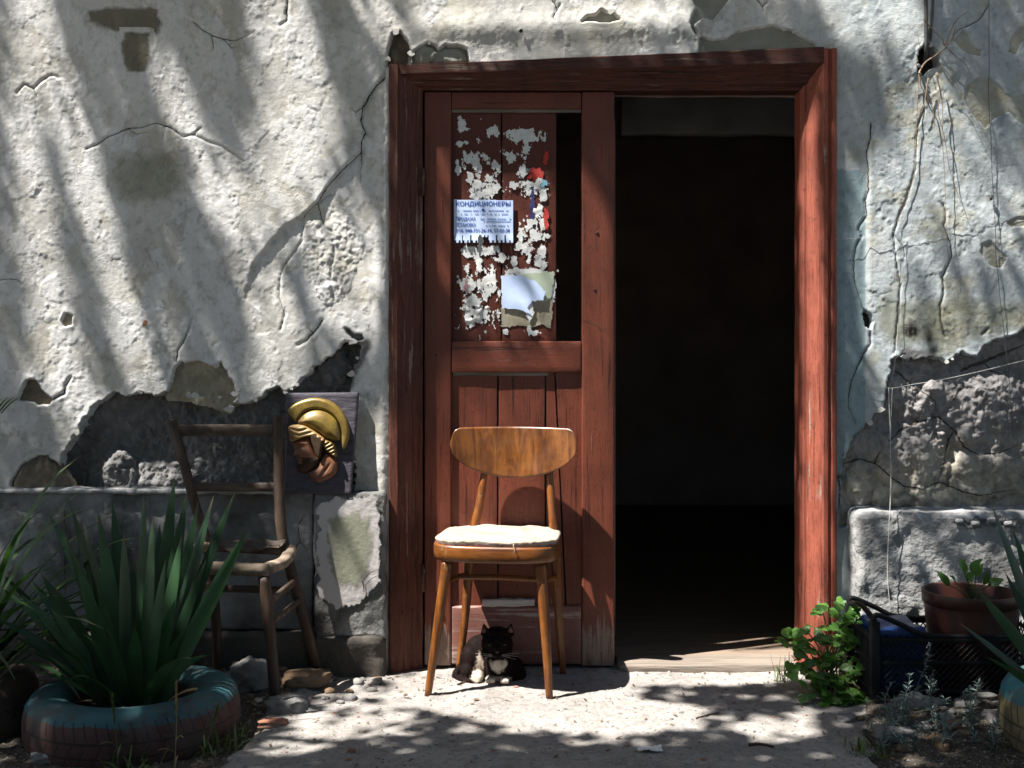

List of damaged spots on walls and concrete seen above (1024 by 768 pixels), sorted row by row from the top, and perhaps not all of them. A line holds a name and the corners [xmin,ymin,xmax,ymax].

crack [193,22,243,48]
spalling [384,28,469,67]
spalling [583,9,618,22]
crack [86,123,244,162]
crack [279,77,386,345]
crack [848,110,924,421]
crack [940,204,952,335]
spalling [13,328,364,488]
crack [837,329,1024,511]
spalling [839,329,1024,529]